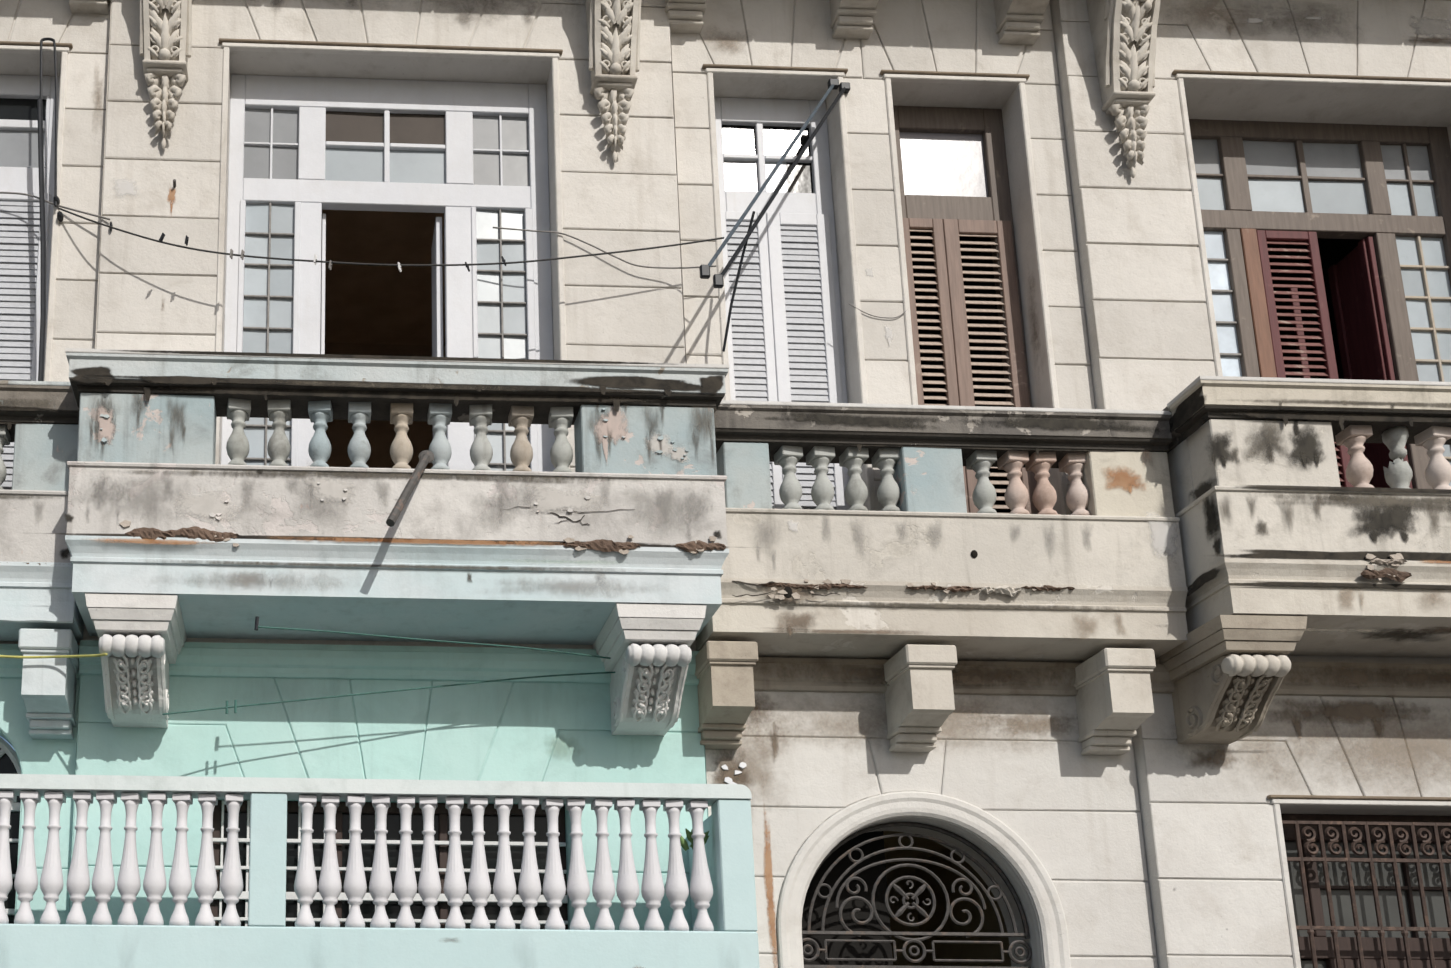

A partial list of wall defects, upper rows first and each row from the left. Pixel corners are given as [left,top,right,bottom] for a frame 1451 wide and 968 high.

peeling [98,407,115,444]
peeling [595,405,627,460]
peeling [647,435,689,462]
rust [1108,470,1140,493]
leakage [1169,385,1451,596]
spalling [119,520,239,547]
spalling [563,535,641,555]
spalling [674,531,726,554]
spalling [1361,553,1412,583]
spalling [758,579,868,600]
spalling [906,582,981,594]